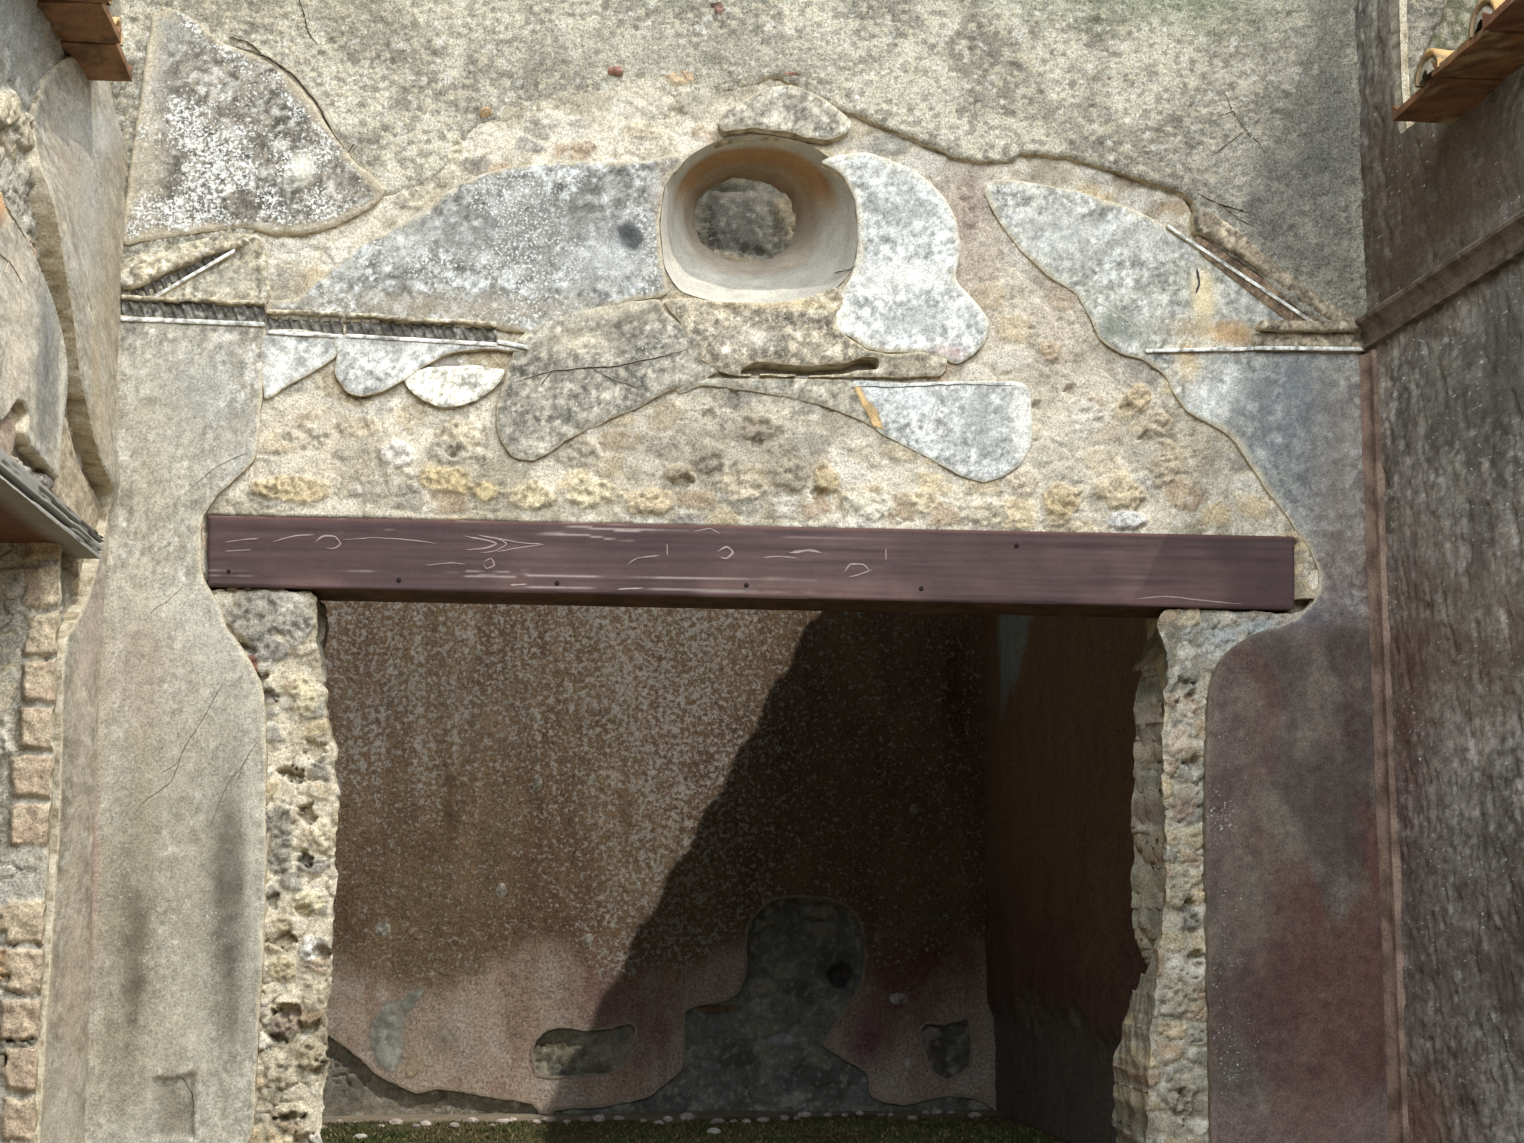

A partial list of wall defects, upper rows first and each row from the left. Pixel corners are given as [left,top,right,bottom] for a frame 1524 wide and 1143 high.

crack [513,349,688,388]
spalling [201,70,1318,1143]
crack [135,676,227,812]
crack [207,739,260,833]